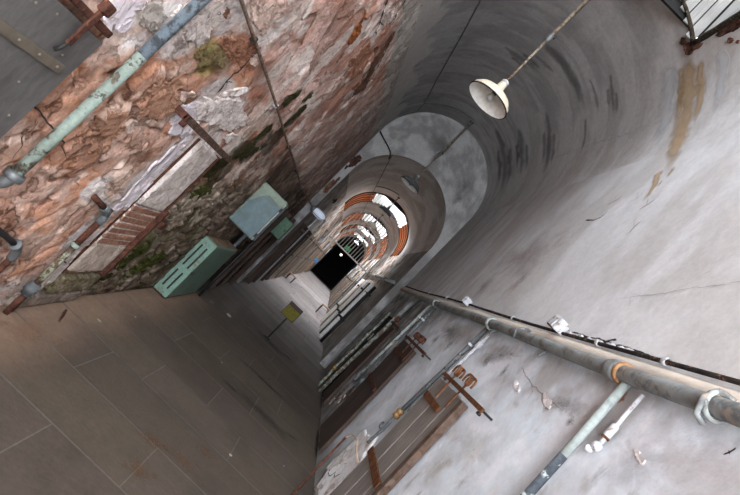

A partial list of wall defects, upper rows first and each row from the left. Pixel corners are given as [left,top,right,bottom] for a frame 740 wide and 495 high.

flaking render [102,0,189,35]
crack [218,53,257,92]
crack [13,106,67,160]
flaking render [40,71,250,288]